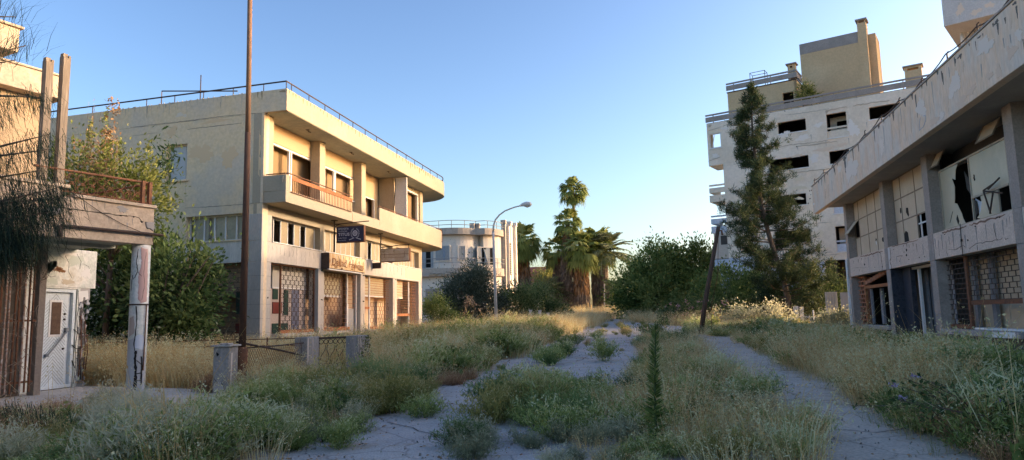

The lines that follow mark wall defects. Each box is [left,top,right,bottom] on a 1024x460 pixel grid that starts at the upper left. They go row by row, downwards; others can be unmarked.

crack [67,208,153,231]
peeling [138,247,148,303]
crack [131,253,146,390]